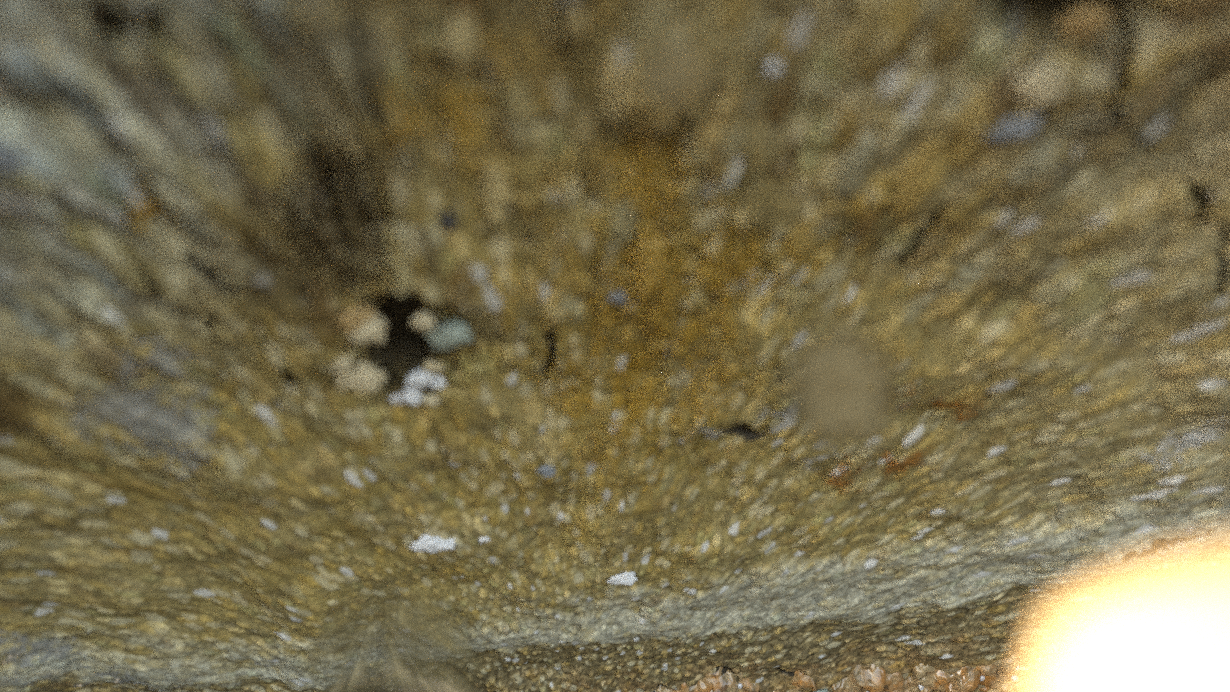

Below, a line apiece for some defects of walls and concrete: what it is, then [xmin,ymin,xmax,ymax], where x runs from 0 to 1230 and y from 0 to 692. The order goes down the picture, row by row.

crack [1214,223,1230,296]
spalling [331,293,473,408]
corrosion [653,644,1056,692]